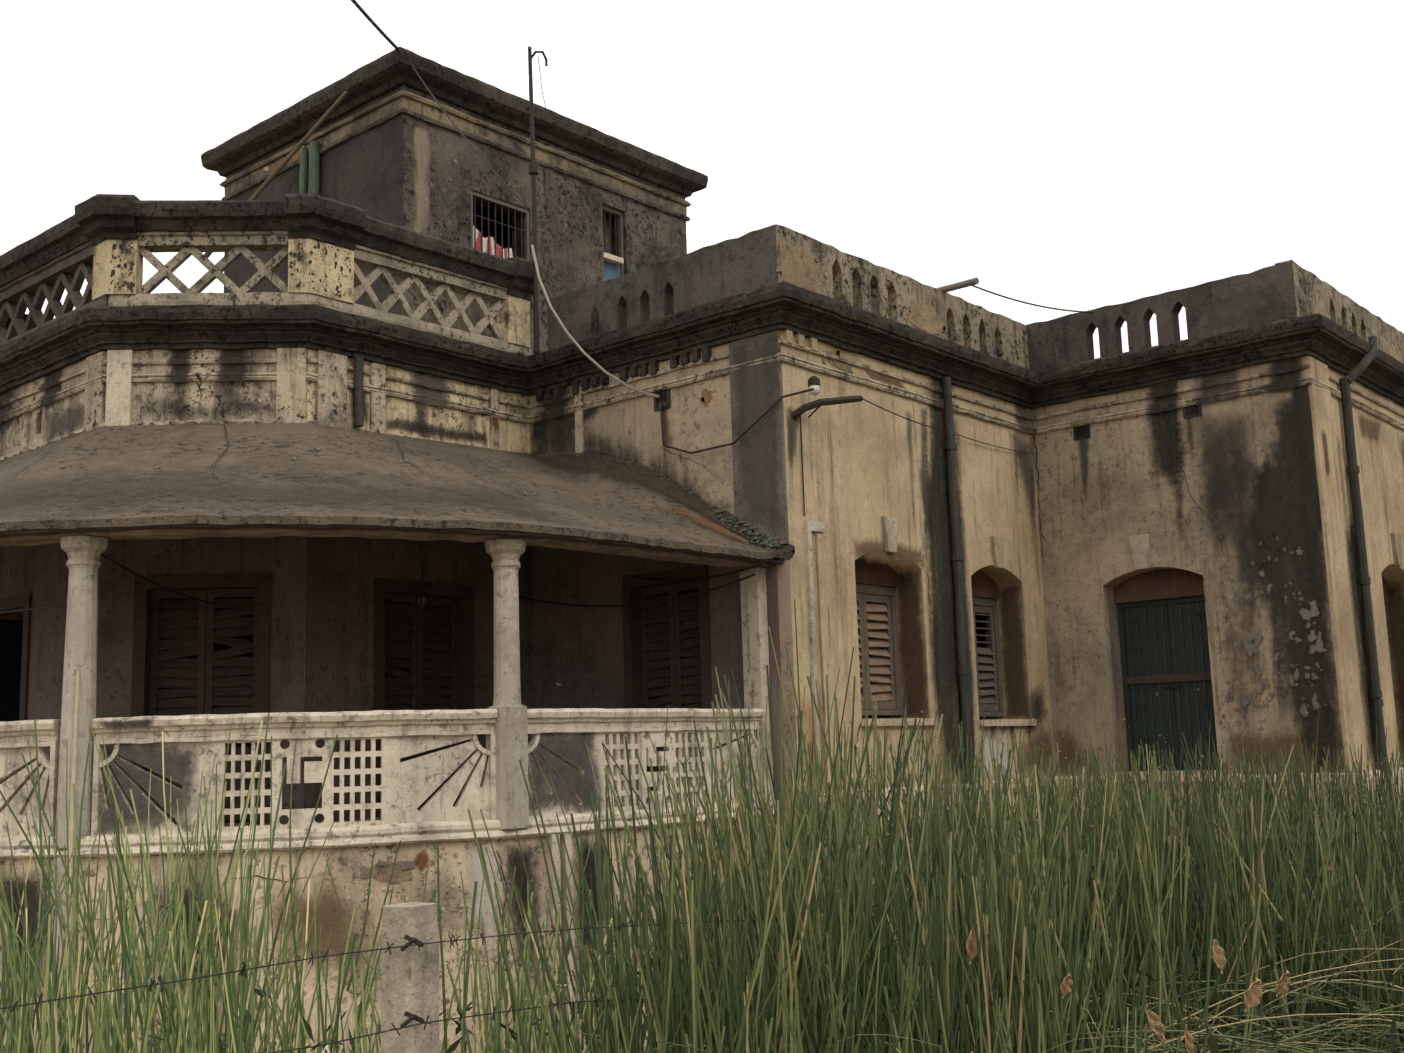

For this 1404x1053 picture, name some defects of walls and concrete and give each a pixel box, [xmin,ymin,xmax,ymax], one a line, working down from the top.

water stain [150,350,194,417]
water stain [216,350,258,413]
water stain [1147,357,1336,770]
peeling [1218,536,1327,724]
water stain [1387,585,1404,751]
water stain [98,719,194,834]
spalling [361,859,415,884]